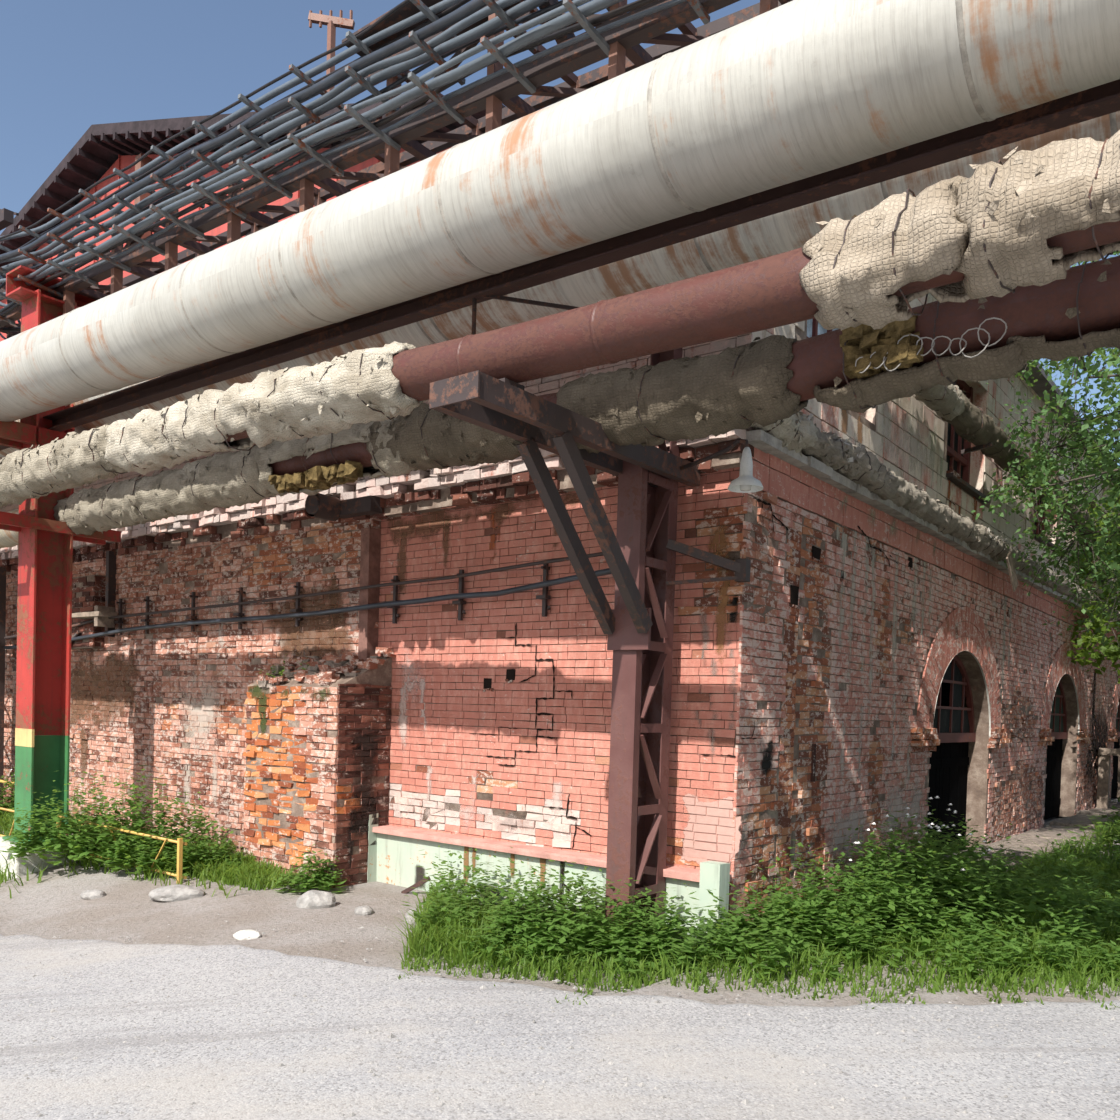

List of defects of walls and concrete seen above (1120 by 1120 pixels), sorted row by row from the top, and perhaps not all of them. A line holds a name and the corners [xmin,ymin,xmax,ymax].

crack [471,623,573,767]
spalling [389,766,581,848]
crack [548,794,592,900]